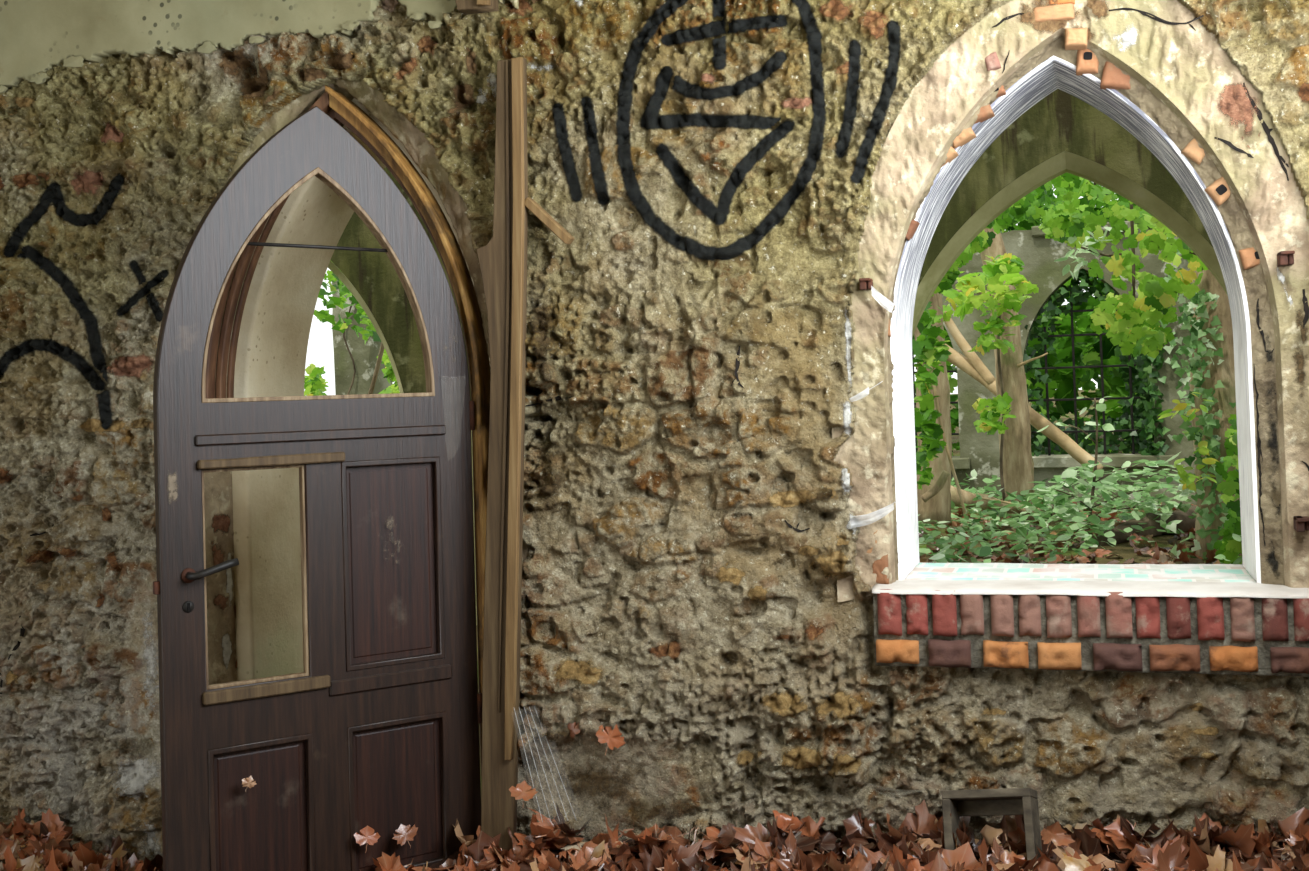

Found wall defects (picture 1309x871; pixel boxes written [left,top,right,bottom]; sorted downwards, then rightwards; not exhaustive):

flaking render [0,0,457,93]
spalling [1020,0,1108,41]
crack [1123,9,1197,31]
spalling [448,47,477,119]
crack [1215,83,1289,181]